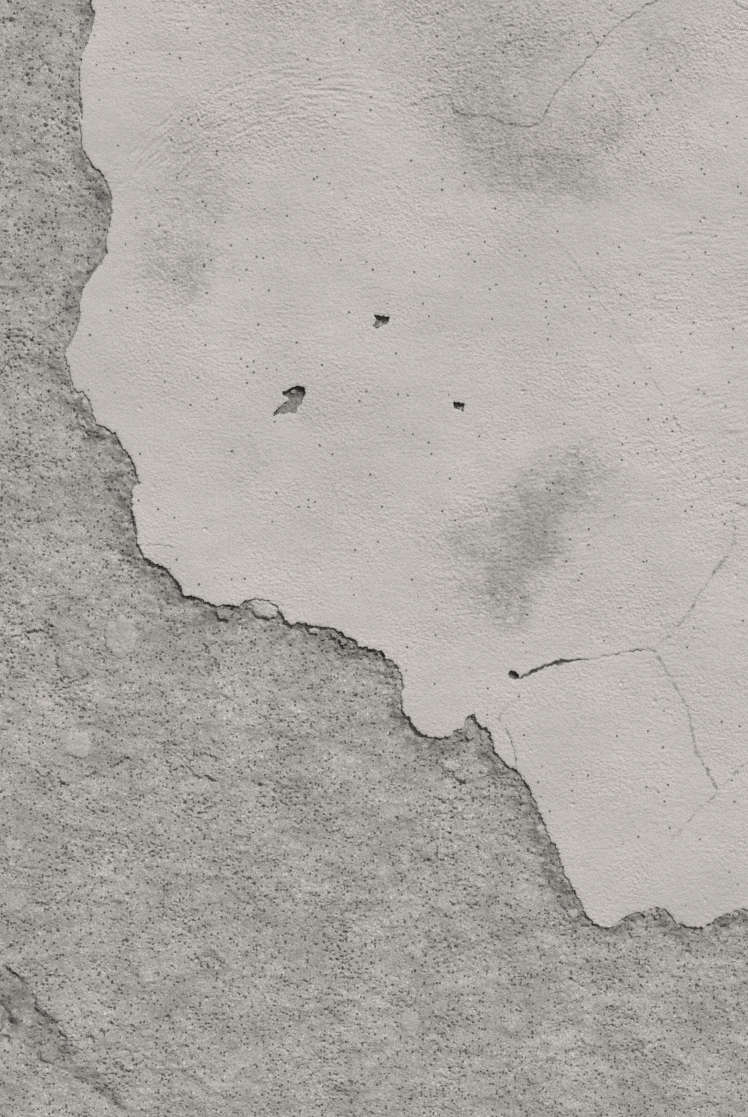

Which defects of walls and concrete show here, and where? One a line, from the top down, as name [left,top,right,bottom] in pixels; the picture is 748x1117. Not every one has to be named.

spalling [64,0,417,745]
crack [520,659,586,679]
spalling [458,714,697,938]